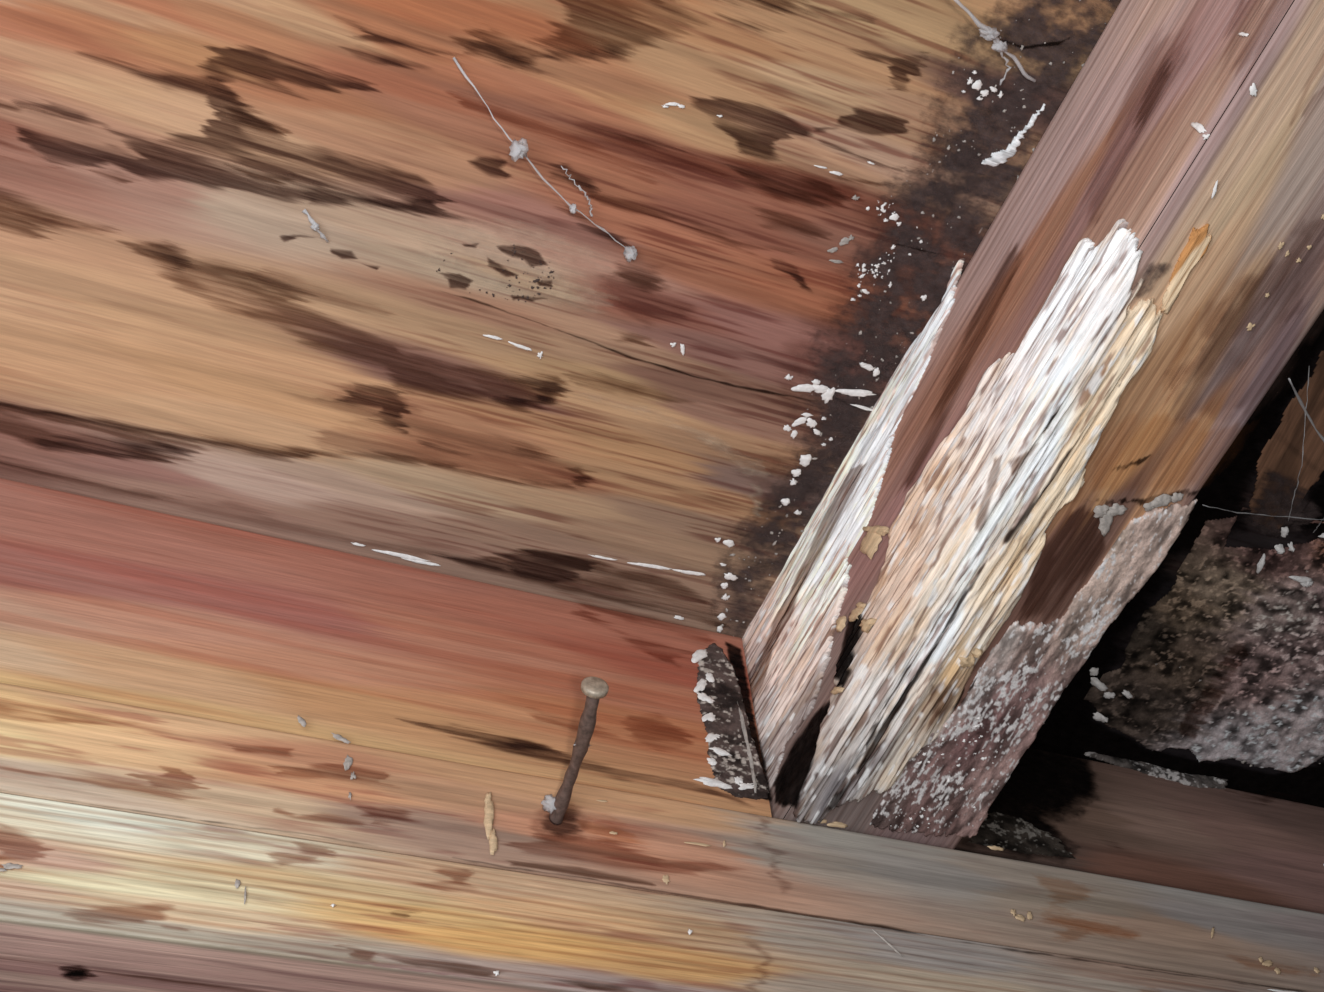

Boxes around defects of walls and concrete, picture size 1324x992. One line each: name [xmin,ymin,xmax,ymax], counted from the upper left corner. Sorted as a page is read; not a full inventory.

water stain [21,130,277,194]
water stain [143,49,445,216]
water stain [473,159,508,177]
water stain [436,244,554,302]
water stain [691,0,1121,800]
water stain [869,310,1324,859]
spalling [831,602,877,695]
peeling [959,648,983,668]